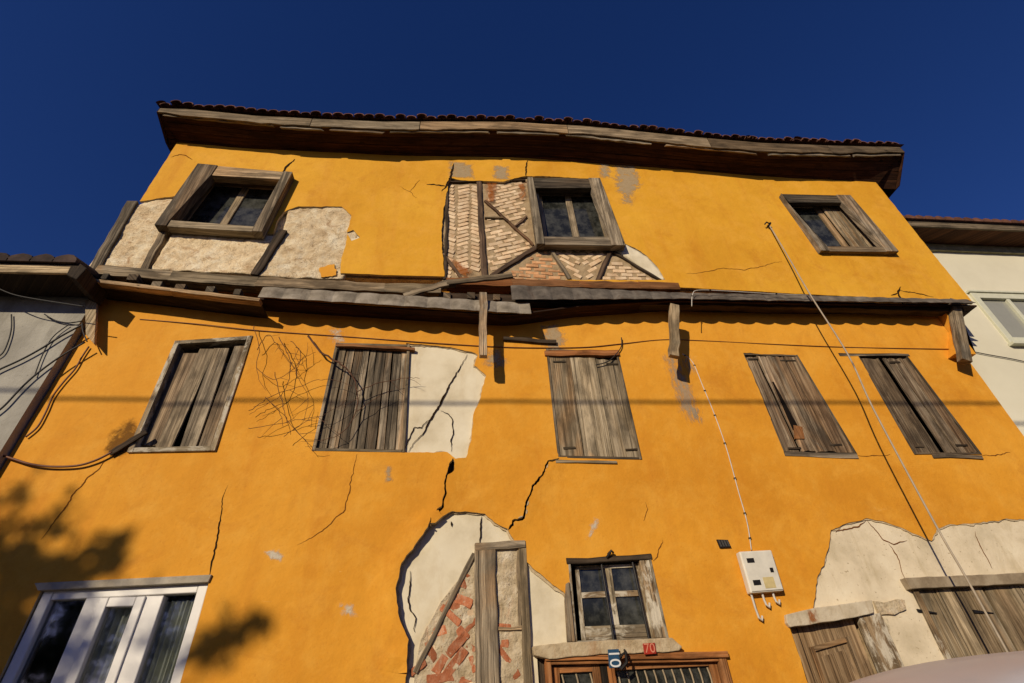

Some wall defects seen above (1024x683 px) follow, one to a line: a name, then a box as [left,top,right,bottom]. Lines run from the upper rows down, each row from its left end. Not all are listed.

flaking render [89,198,359,281]
flaking render [442,162,665,281]
crack [42,456,111,538]
crack [209,492,225,575]
crack [307,455,357,540]
crack [405,356,467,526]
flaking render [405,345,505,462]
flaking render [396,512,567,683]
crack [509,460,555,529]
flaking render [813,518,1024,666]